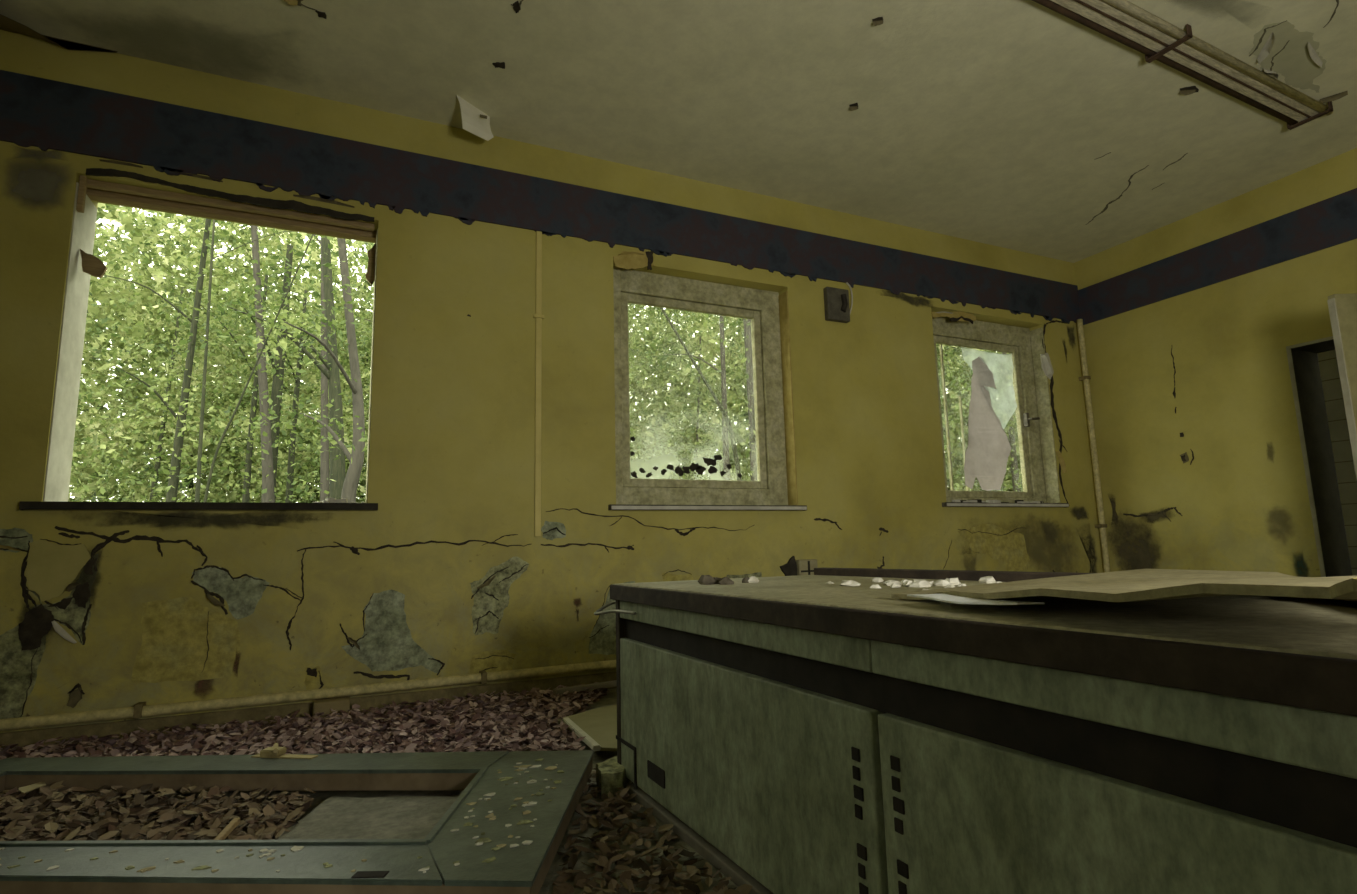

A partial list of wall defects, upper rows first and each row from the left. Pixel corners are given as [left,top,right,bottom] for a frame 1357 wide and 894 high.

crack [1323,0,1339,28]
peeling [85,159,374,222]
flaking render [0,527,130,719]
crack [55,526,208,566]
peeling [340,590,445,680]
peeling [470,556,529,636]
crack [285,508,754,650]